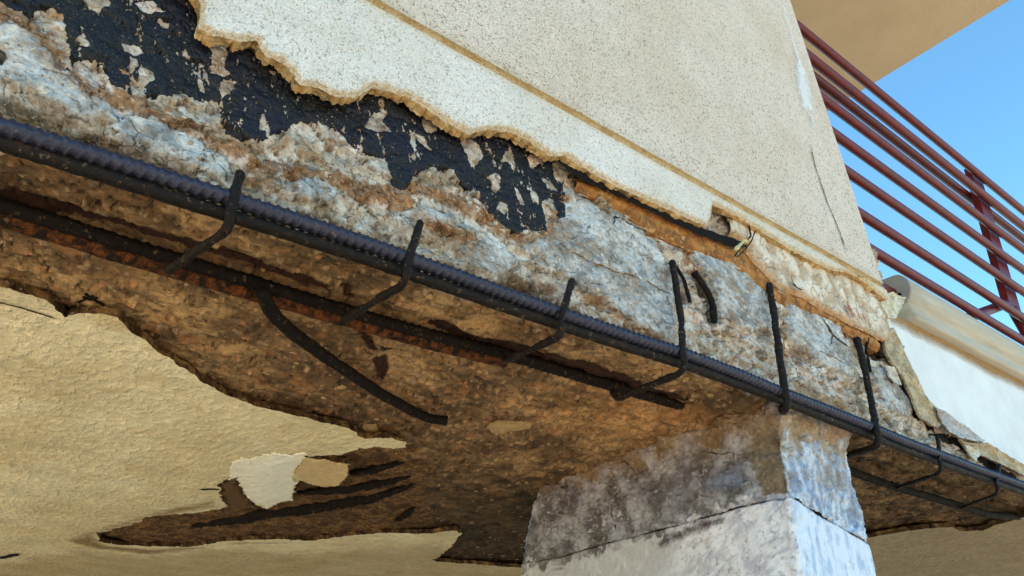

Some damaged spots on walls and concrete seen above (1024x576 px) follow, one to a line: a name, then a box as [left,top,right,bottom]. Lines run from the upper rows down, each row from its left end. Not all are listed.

rust [0,188,354,300]
spalling [0,0,780,386]
crack [810,146,846,253]
rust [358,331,392,380]
spalling [0,151,769,564]
rust [426,319,689,401]
spalling [775,249,1024,481]
crack [551,491,616,560]
crack [641,501,765,535]
crack [795,498,867,543]
spalling [846,434,1024,533]